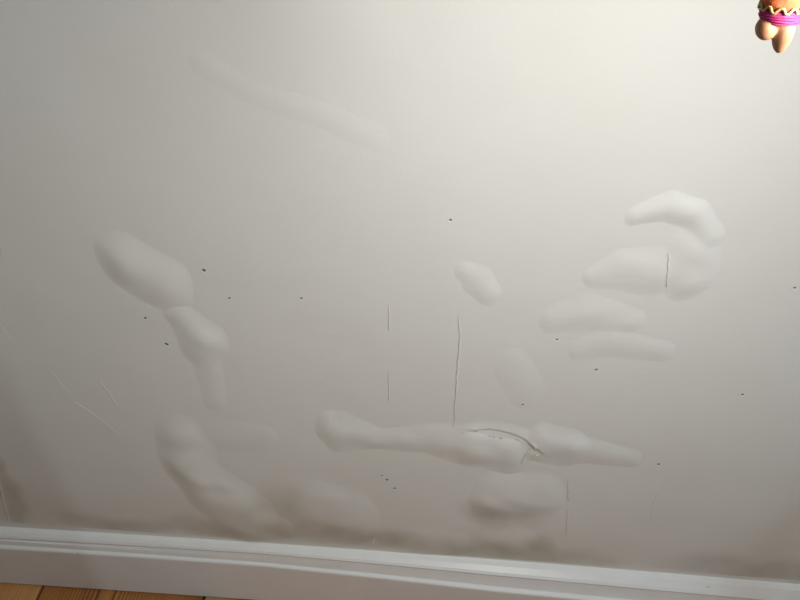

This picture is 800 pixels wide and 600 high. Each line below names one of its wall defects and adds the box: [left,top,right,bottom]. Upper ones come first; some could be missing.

crack [453,320,461,425]